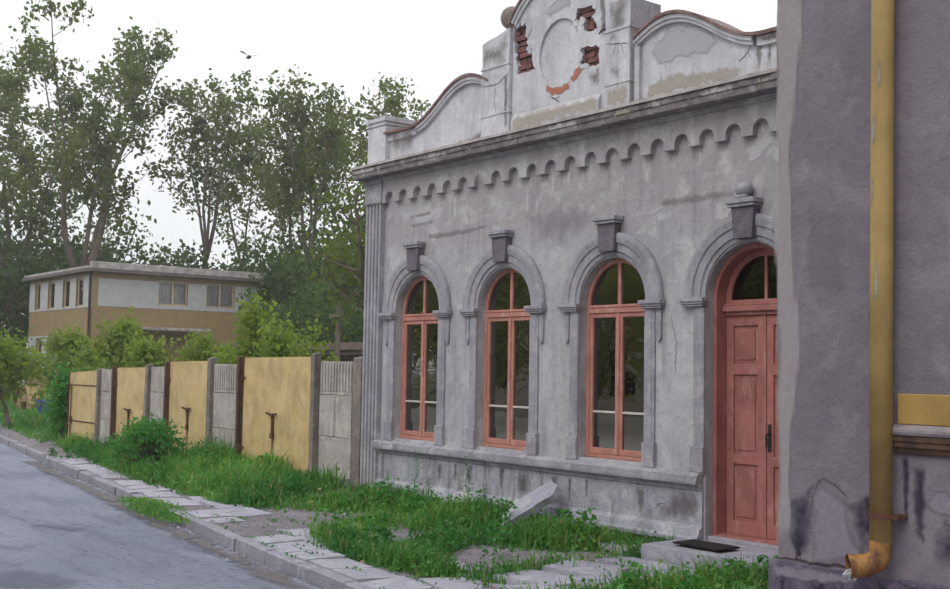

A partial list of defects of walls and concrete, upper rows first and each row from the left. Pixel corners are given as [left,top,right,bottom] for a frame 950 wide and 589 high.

flaking render [514,19,535,74]
flaking render [546,1,601,95]
crack [810,478,869,512]
leakage [904,460,925,531]
leakage [794,504,806,555]
leakage [774,566,856,589]